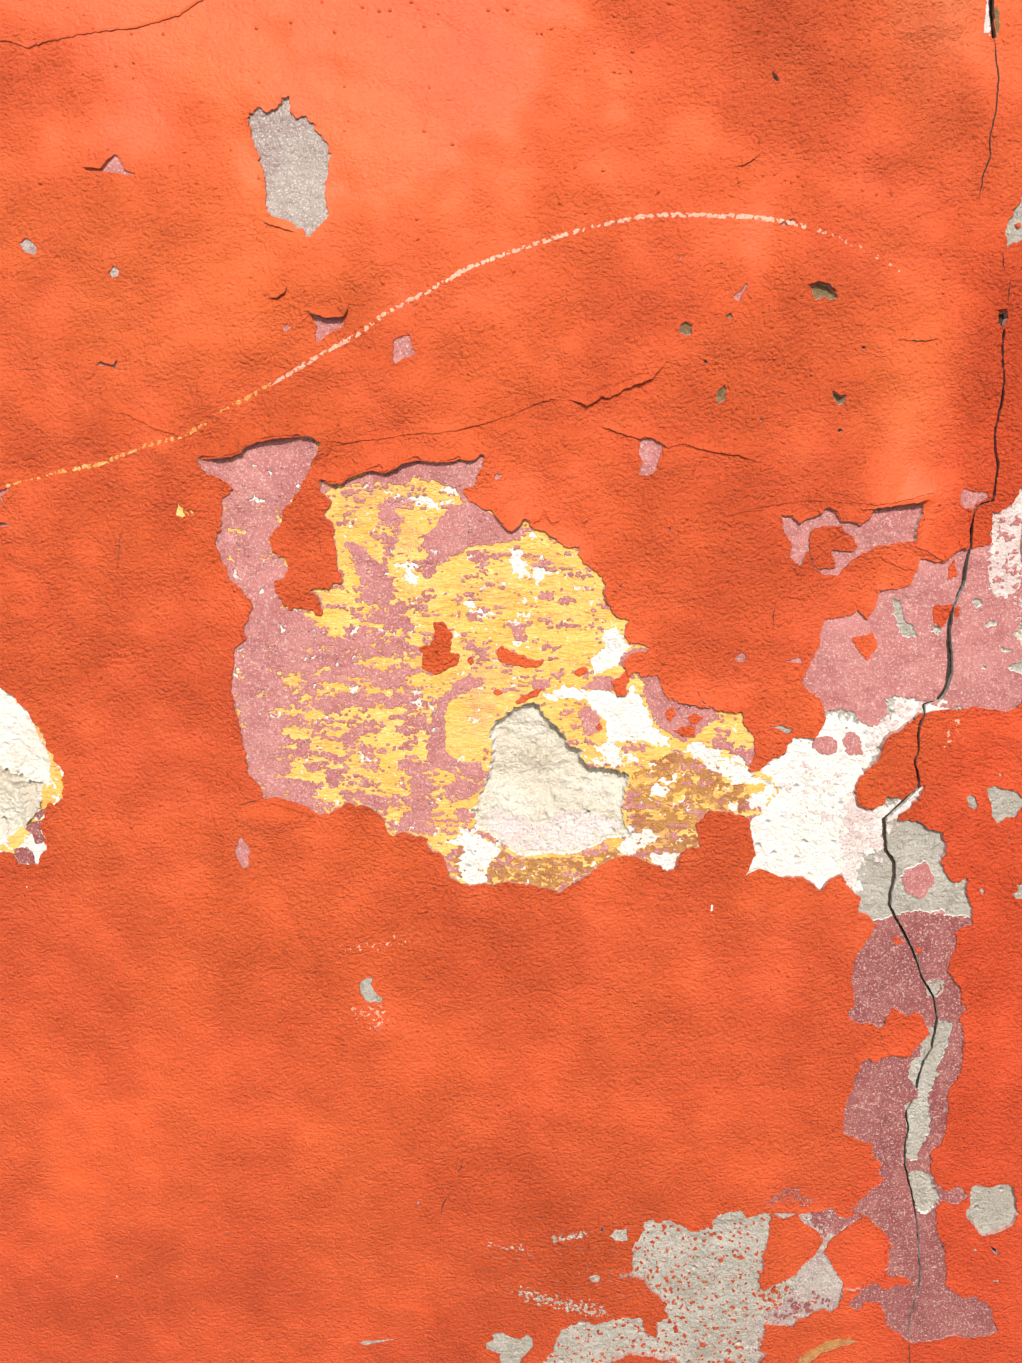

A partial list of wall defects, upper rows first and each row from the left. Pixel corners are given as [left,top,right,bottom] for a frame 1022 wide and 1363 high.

peeling [249,99,331,236]
crack [980,0,1000,192]
peeling [1005,196,1022,246]
flaking render [0,688,64,865]
peeling [200,300,1022,1363]
crack [882,395,1002,1271]